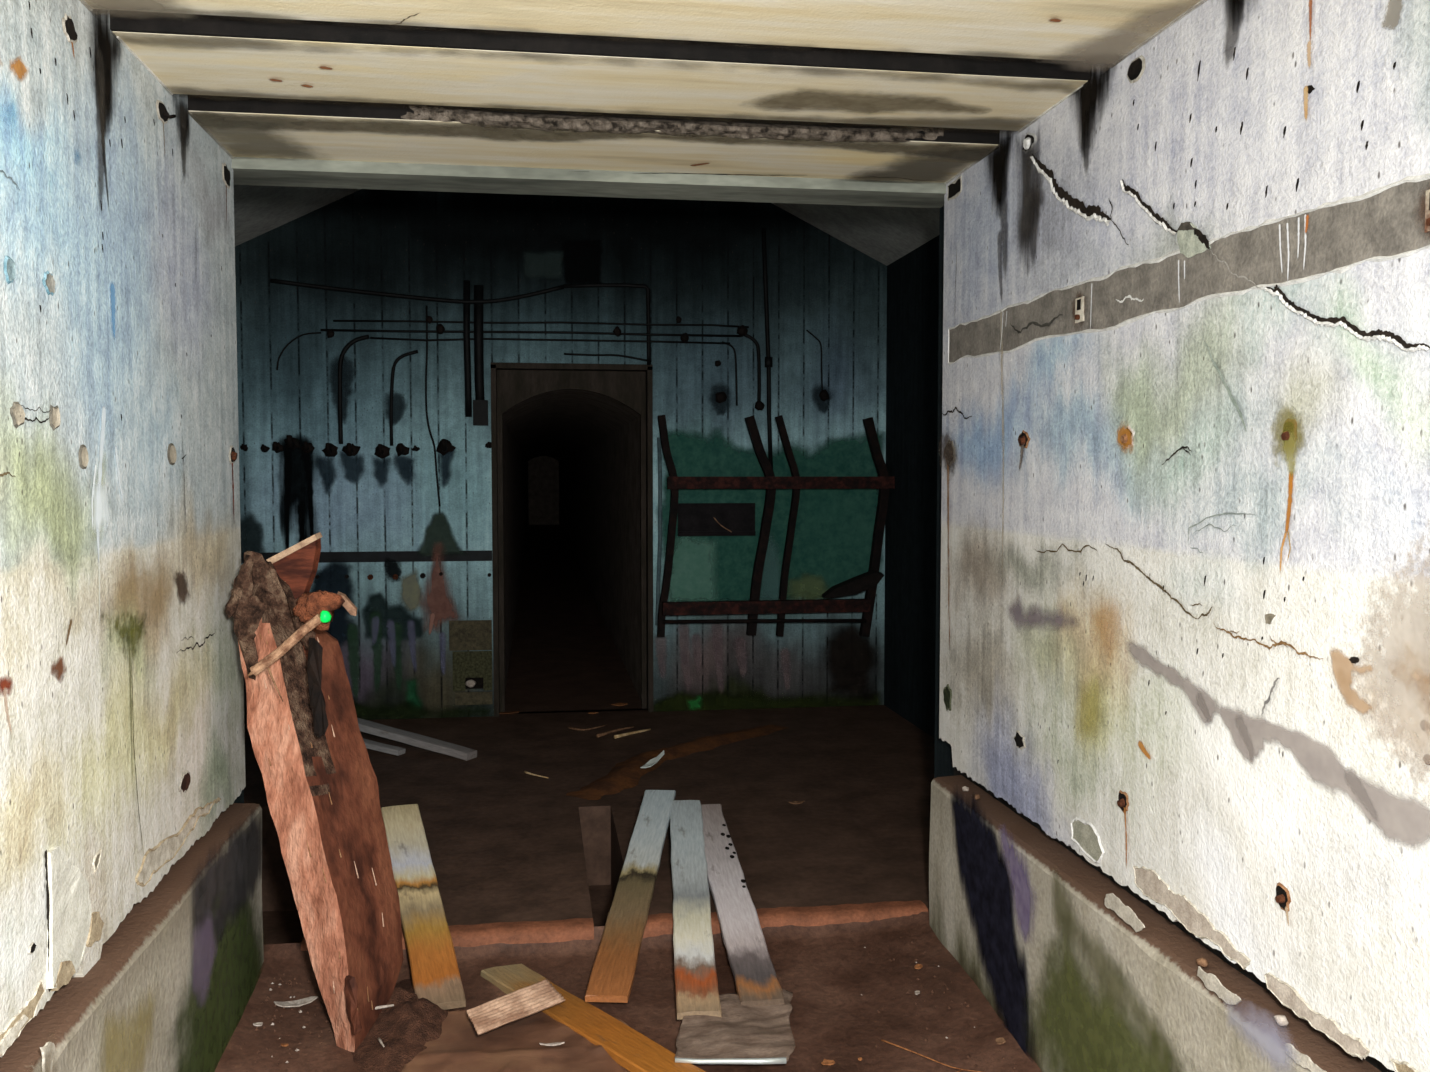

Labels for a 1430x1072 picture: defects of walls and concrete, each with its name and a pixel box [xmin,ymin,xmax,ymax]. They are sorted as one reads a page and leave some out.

corrosion [1304,85,1315,119]
crack [1030,153,1211,258]
peeling [948,173,1430,365]
crack [1264,284,1430,352]
crack [1205,342,1247,432]
corrosion [1275,410,1302,571]
crack [1037,543,1323,714]
spalling [1104,893,1145,932]
peeling [1133,866,1251,970]
spalling [0,979,46,1057]
spalling [1197,966,1241,1005]
peeling [1264,972,1370,1060]